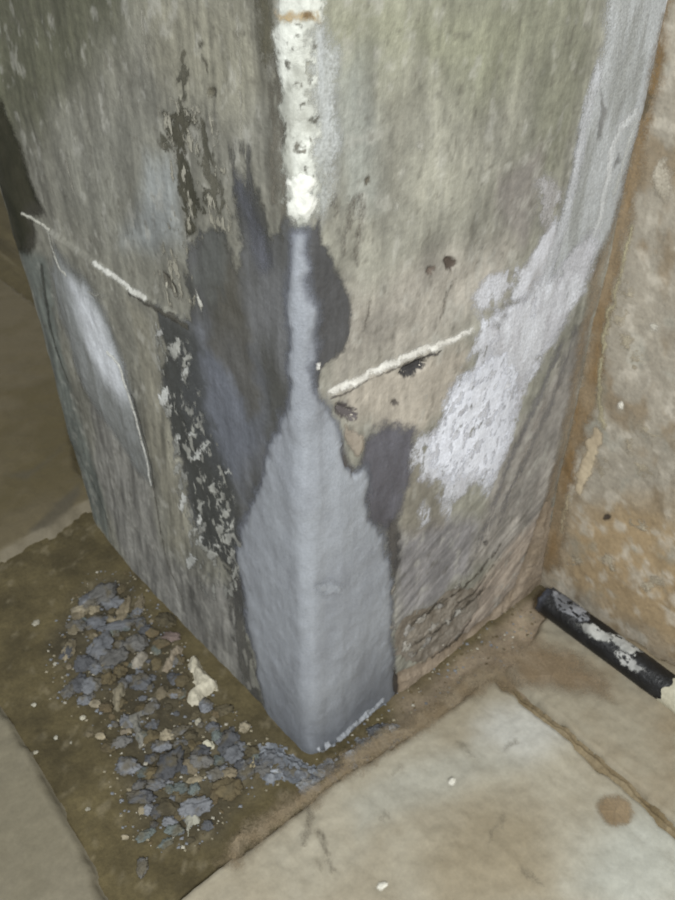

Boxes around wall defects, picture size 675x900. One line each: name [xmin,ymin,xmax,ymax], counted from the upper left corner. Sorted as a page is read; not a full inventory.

spalling [159,65,231,253]
crack [21,212,69,382]
crack [87,260,189,330]
spalling [154,243,203,310]
water stain [156,0,351,703]
crack [328,328,473,399]
water stain [361,0,668,579]
flaking render [154,325,242,601]